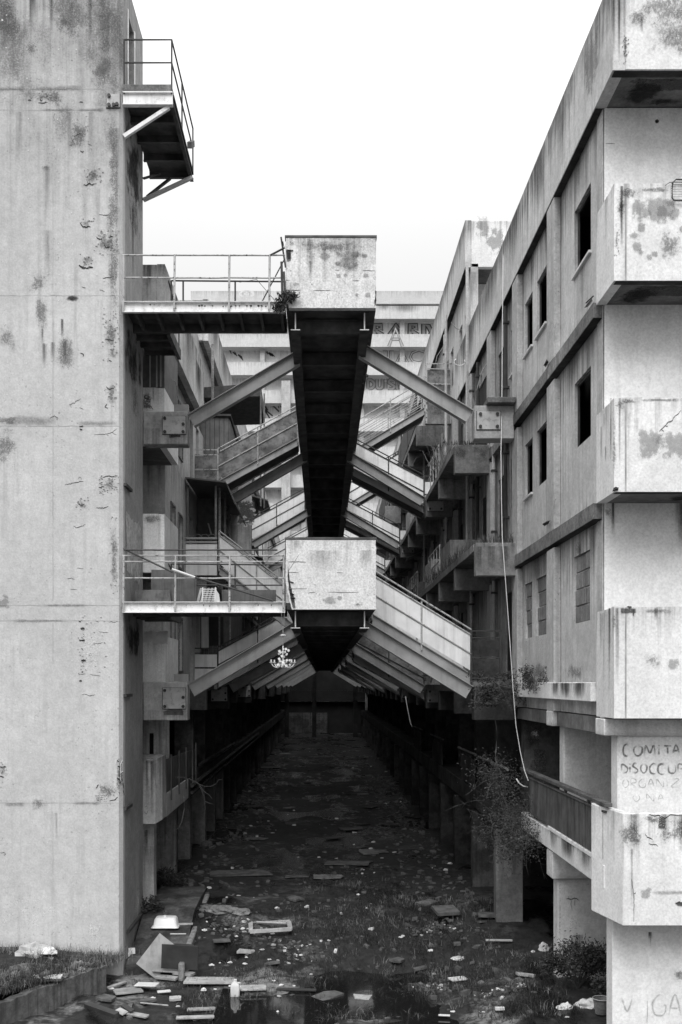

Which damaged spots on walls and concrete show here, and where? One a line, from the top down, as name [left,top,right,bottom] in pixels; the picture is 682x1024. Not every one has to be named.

damp [38,305,70,363]